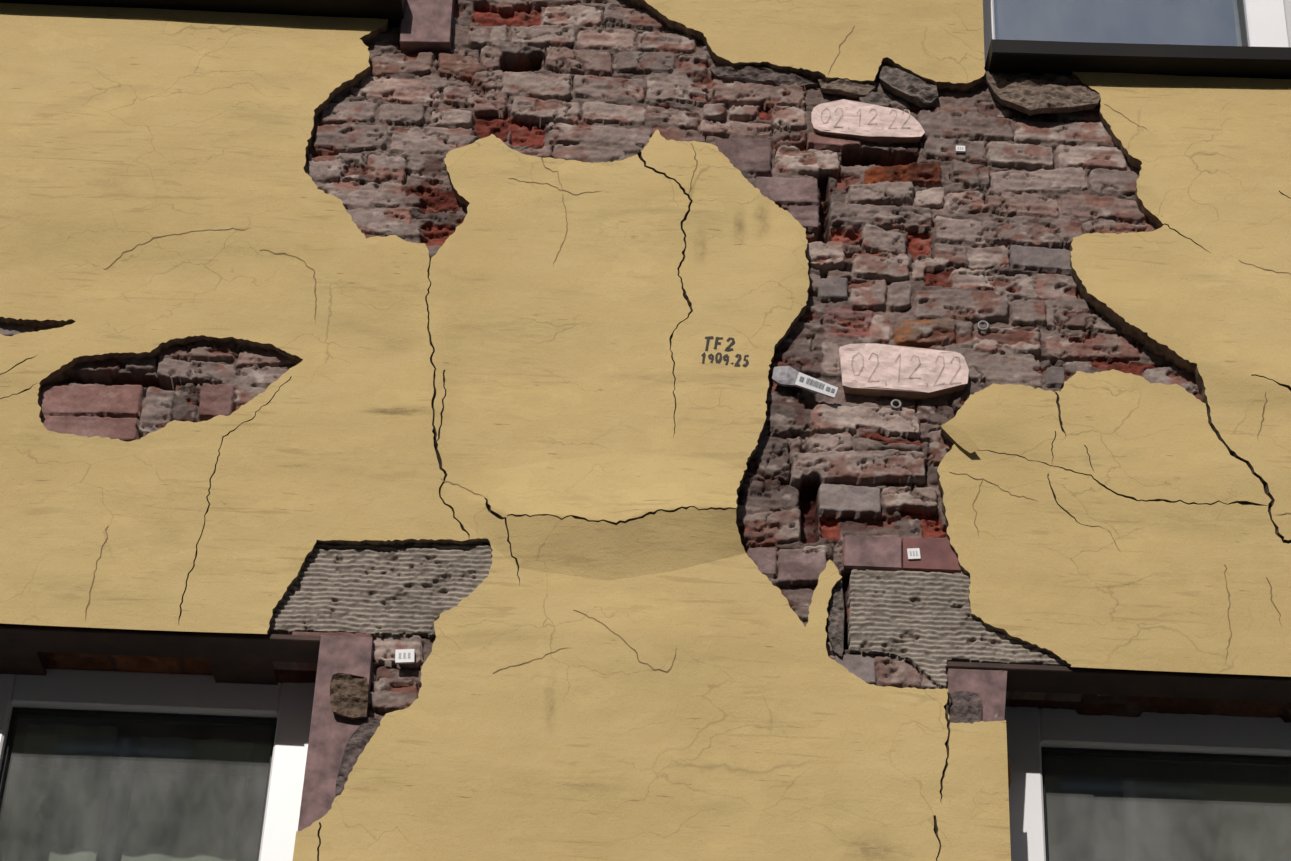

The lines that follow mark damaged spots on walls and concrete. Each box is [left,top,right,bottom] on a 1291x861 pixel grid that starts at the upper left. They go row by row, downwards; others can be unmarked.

spalling [0,317,76,336]
spalling [38,335,303,442]
crack [178,377,291,623]
crack [509,157,603,263]
crack [425,257,739,586]
crack [639,143,698,439]
spalling [303,0,1207,725]
crack [949,374,1291,552]
crack [1164,223,1209,252]
spalling [267,538,493,831]
crack [575,610,677,672]
crack [934,693,952,861]